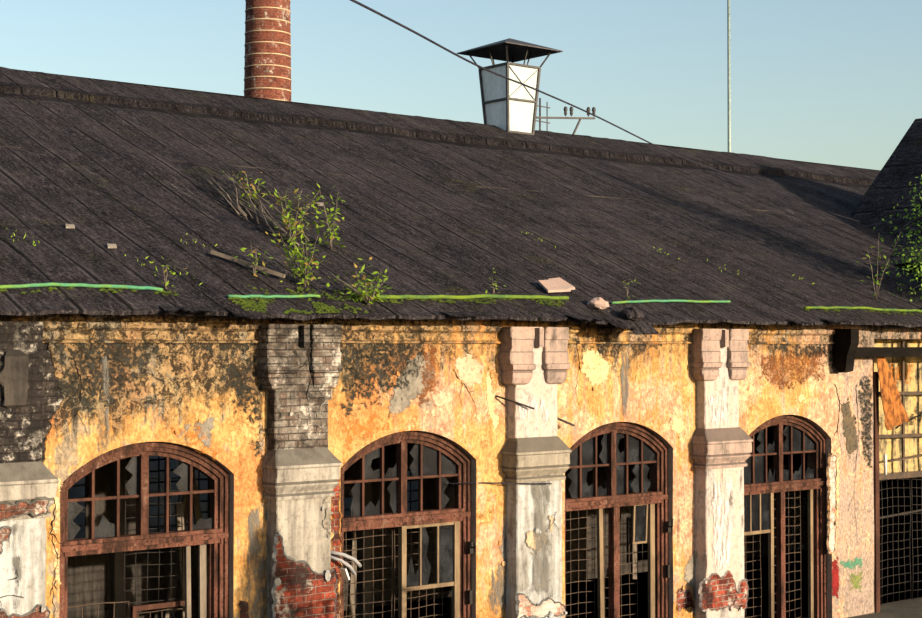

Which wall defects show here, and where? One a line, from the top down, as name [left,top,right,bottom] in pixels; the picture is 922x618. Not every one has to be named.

spalling [42,343,65,463]
damp [48,343,268,457]
damp [340,338,426,416]
spalling [0,604,51,618]
spalling [0,478,63,589]
spalling [236,600,259,618]
spalling [271,479,343,618]
spalling [675,550,749,612]